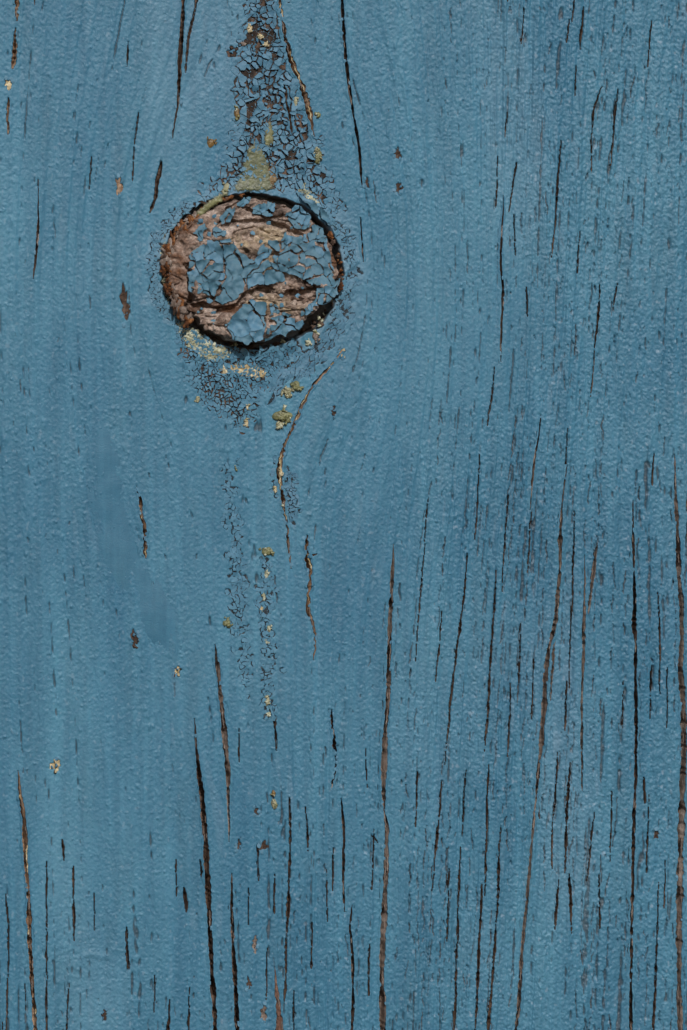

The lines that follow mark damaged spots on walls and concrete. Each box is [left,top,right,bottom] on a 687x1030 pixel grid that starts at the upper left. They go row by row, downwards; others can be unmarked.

crack [566,0,618,173]
crack [645,21,653,67]
peeling [187,192,341,345]
crack [487,112,528,426]
crack [551,140,580,273]
crack [590,283,618,397]
crack [132,0,366,1030]
crack [310,415,687,1030]
crack [2,771,95,1030]